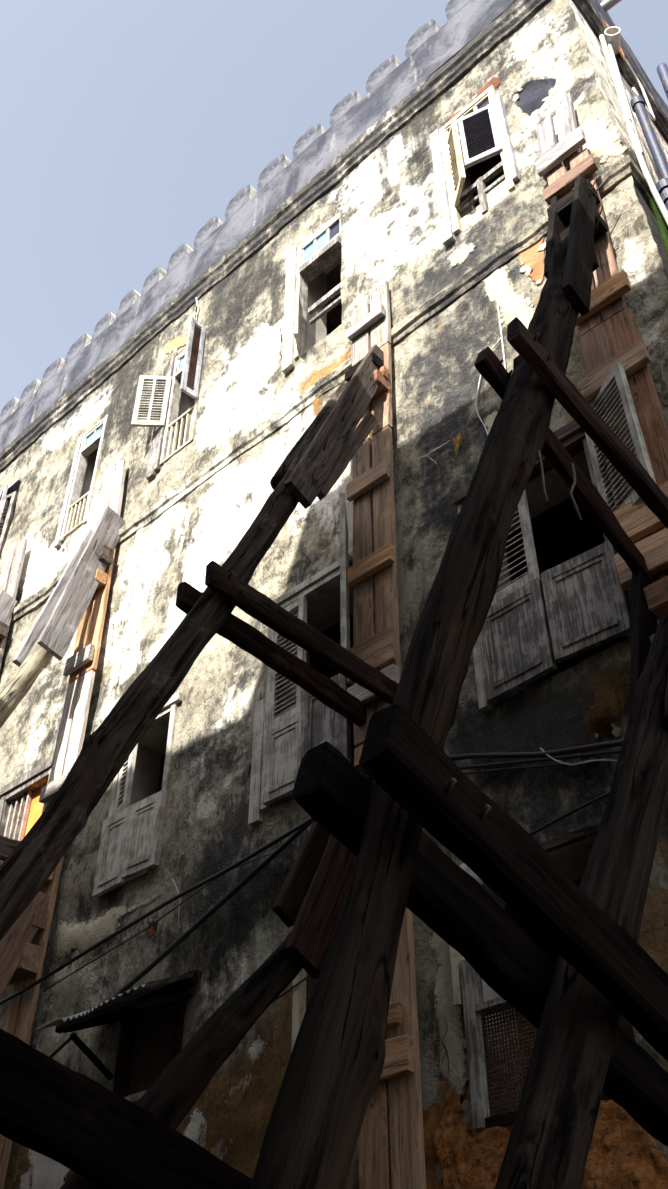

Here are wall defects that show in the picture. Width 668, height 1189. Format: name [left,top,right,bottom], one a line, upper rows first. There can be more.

spalling [447,75,501,121]
spalling [512,78,556,116]
water stain [377,139,394,200]
water stain [401,99,438,217]
spalling [164,332,188,354]
water stain [207,249,281,368]
peeling [482,237,546,332]
water stain [330,459,353,554]
water stain [199,816,308,986]
spalling [429,929,511,1189]
spalling [582,1099,668,1189]